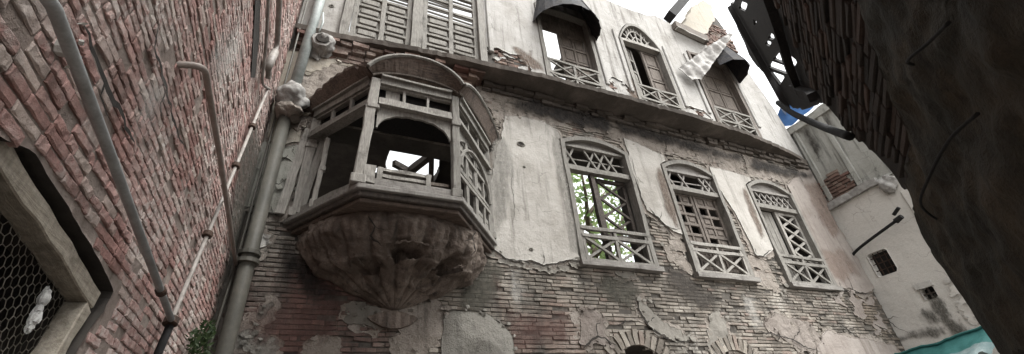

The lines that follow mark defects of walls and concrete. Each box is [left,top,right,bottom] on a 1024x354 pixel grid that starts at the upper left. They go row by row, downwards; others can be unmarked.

spalling [487,48,532,70]
flaking render [259,228,279,261]
spalling [485,250,580,278]
spalling [656,221,693,276]
spalling [746,253,789,295]
flaking render [233,294,285,354]
flaking render [300,297,452,354]
flaking render [569,306,618,352]
flaking render [612,270,732,354]
flaking render [763,309,824,354]
spalling [832,290,890,336]